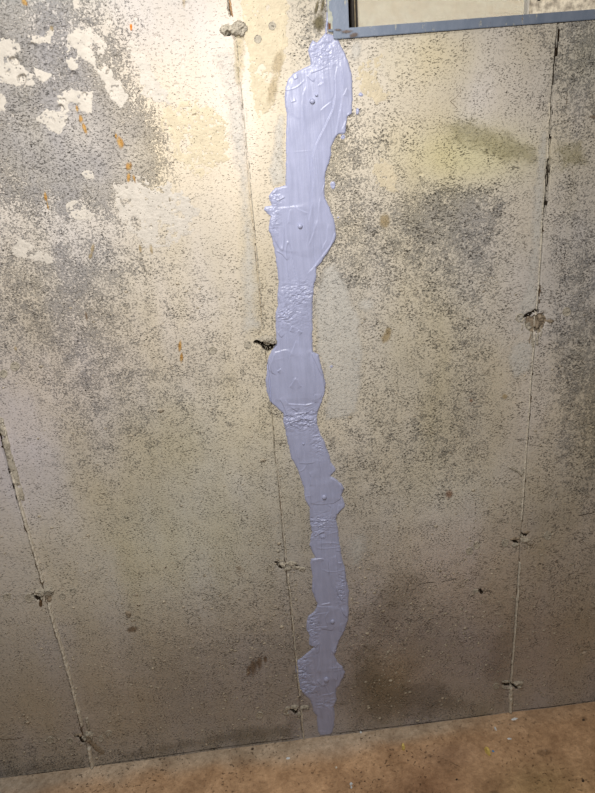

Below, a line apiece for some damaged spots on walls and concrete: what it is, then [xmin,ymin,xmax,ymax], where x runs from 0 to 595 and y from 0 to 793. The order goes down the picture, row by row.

peeling [0,38,52,111]
peeling [28,28,54,44]
peeling [36,88,93,134]
peeling [66,27,128,109]
peeling [128,40,233,178]